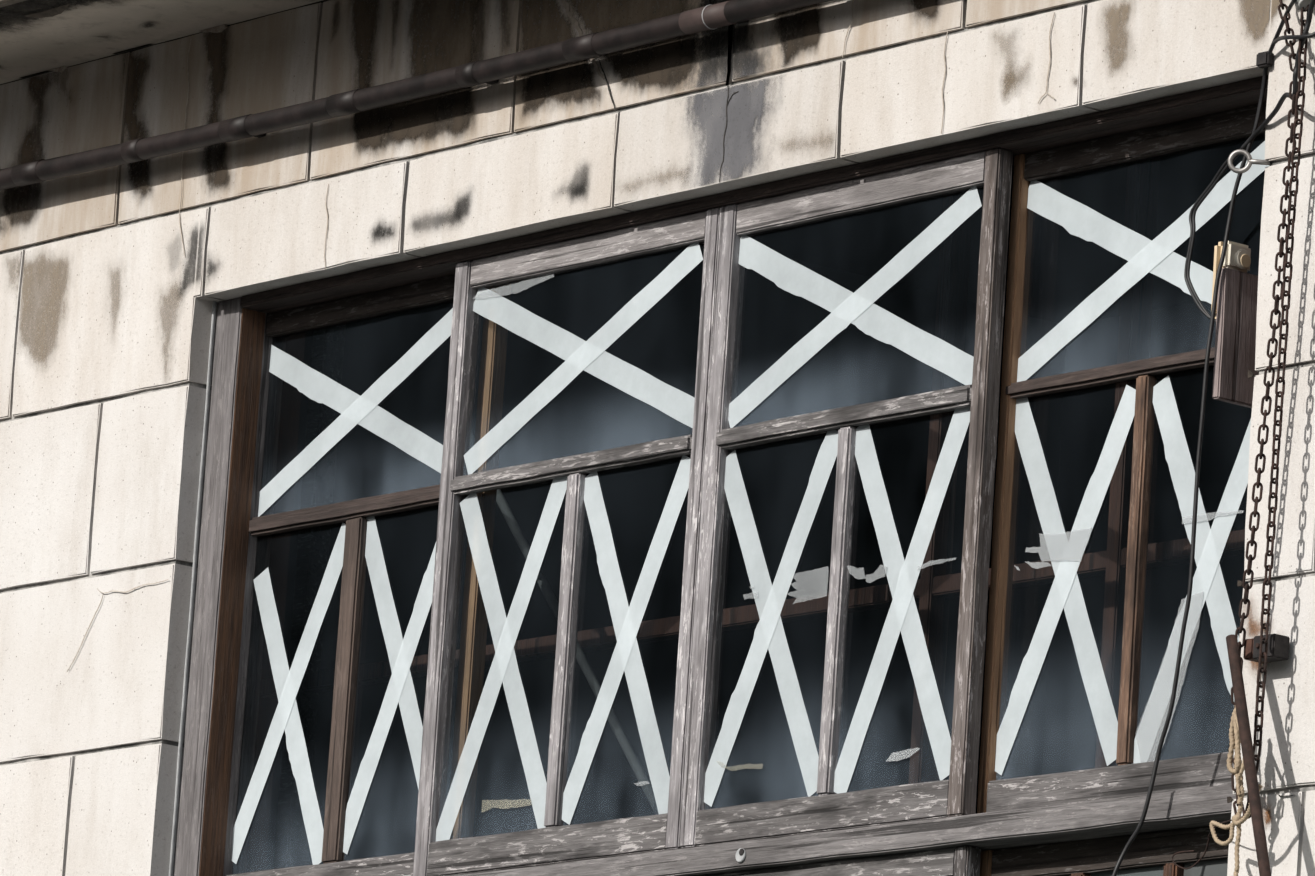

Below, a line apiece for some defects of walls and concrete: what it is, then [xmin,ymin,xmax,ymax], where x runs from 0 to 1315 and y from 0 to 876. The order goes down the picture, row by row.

water stain [333,0,483,89]
water stain [501,0,730,51]
water stain [774,3,822,65]
crack [1038,12,1055,103]
water stain [202,142,230,189]
water stain [353,87,474,152]
water stain [522,20,769,186]
crack [719,85,738,183]
water stain [164,228,215,307]
water stain [373,225,394,240]
water stain [413,195,469,228]
crack [67,579,168,672]